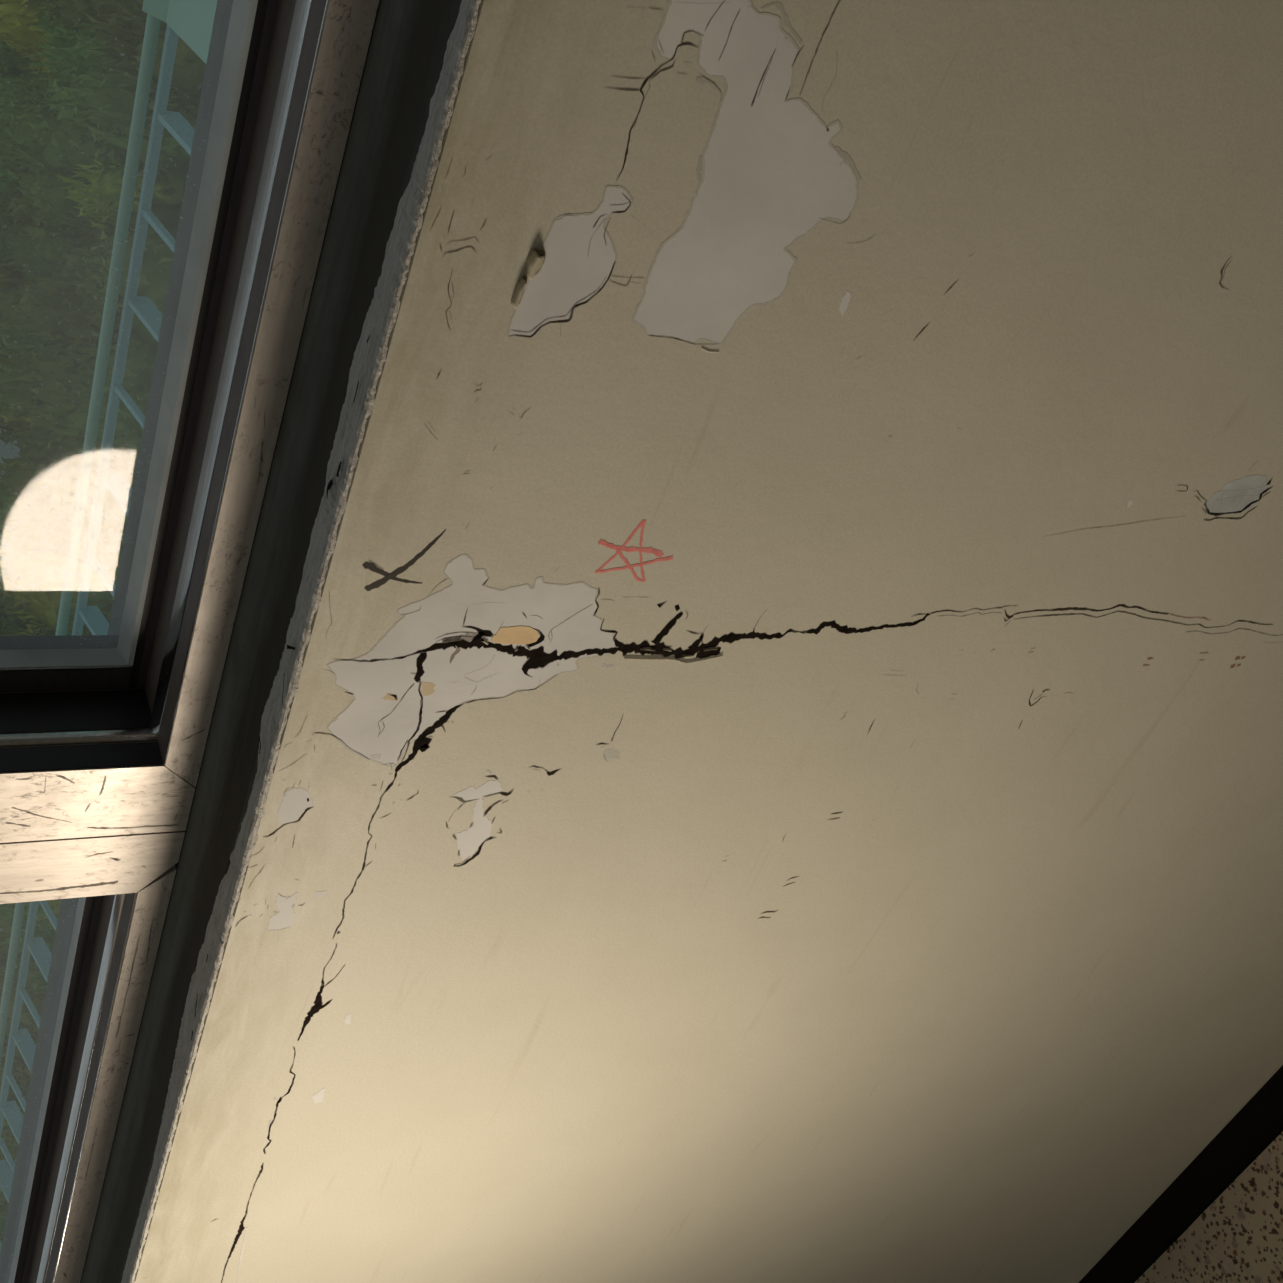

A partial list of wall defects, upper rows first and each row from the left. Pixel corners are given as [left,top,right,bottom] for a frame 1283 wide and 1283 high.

peeling [507,0,861,353]
spalling [121,0,481,1283]
spalling [316,554,618,770]
peeling [446,770,512,867]
crack [221,590,1272,1283]
peeling [1183,475,1271,521]